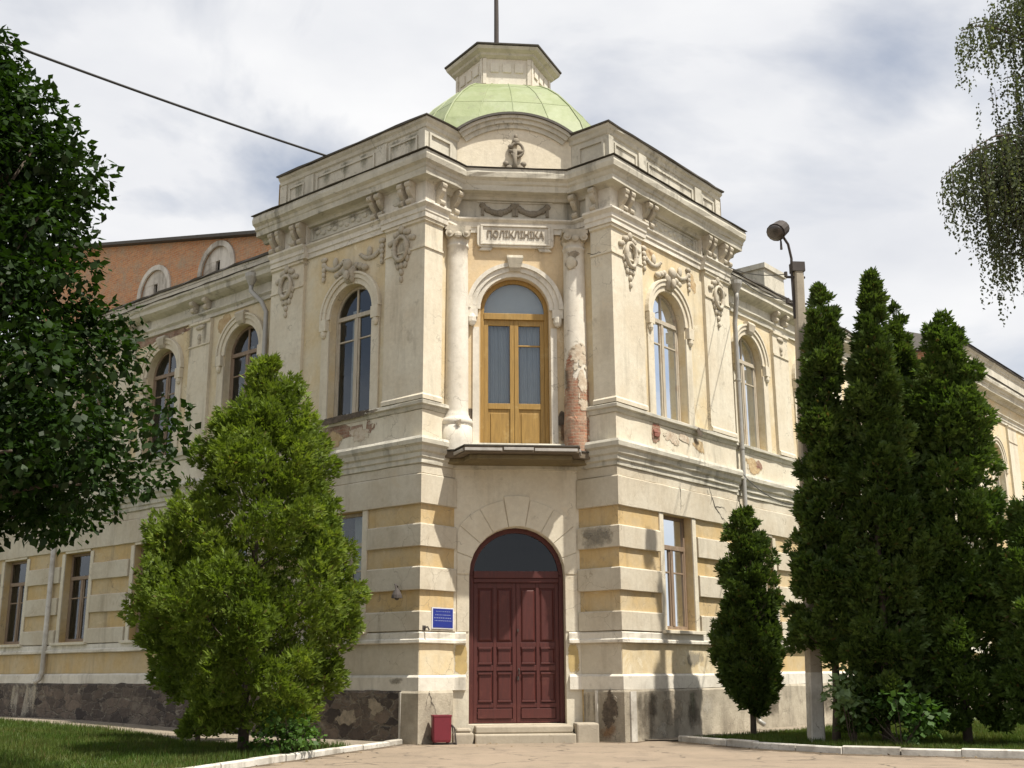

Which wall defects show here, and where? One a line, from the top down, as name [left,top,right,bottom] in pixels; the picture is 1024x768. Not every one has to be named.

flaking render [564,343,590,451]
peeling [324,408,377,447]
peeling [652,423,705,453]
damp [584,530,610,546]
damp [689,694,710,721]